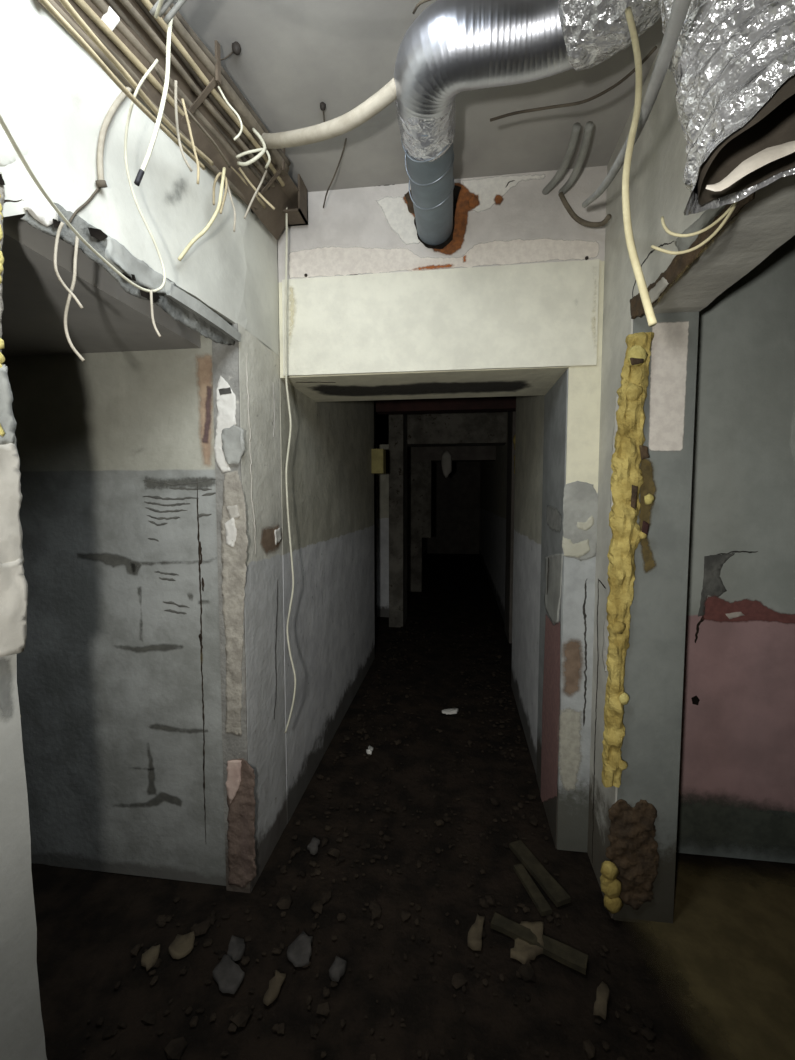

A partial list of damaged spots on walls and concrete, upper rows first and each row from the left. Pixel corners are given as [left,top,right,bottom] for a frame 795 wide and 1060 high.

flaking render [20,193,241,345]
corrosion [403,183,480,270]
peeling [288,197,599,279]
peeling [463,174,545,212]
peeling [0,172,28,657]
crack [197,487,206,839]
peeling [541,468,613,802]
peeling [695,551,795,643]
flaking render [225,758,257,888]